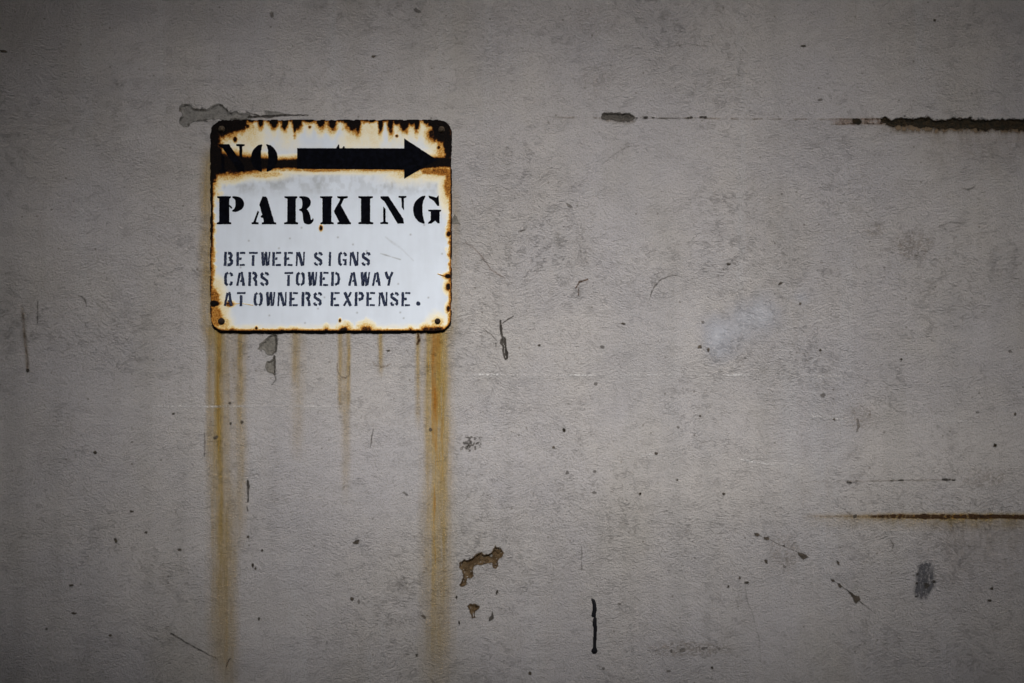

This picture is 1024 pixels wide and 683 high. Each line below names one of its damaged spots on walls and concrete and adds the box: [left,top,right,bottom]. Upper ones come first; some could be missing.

rust [210,314,221,454]
rust [416,330,445,583]
spalling [456,546,504,599]